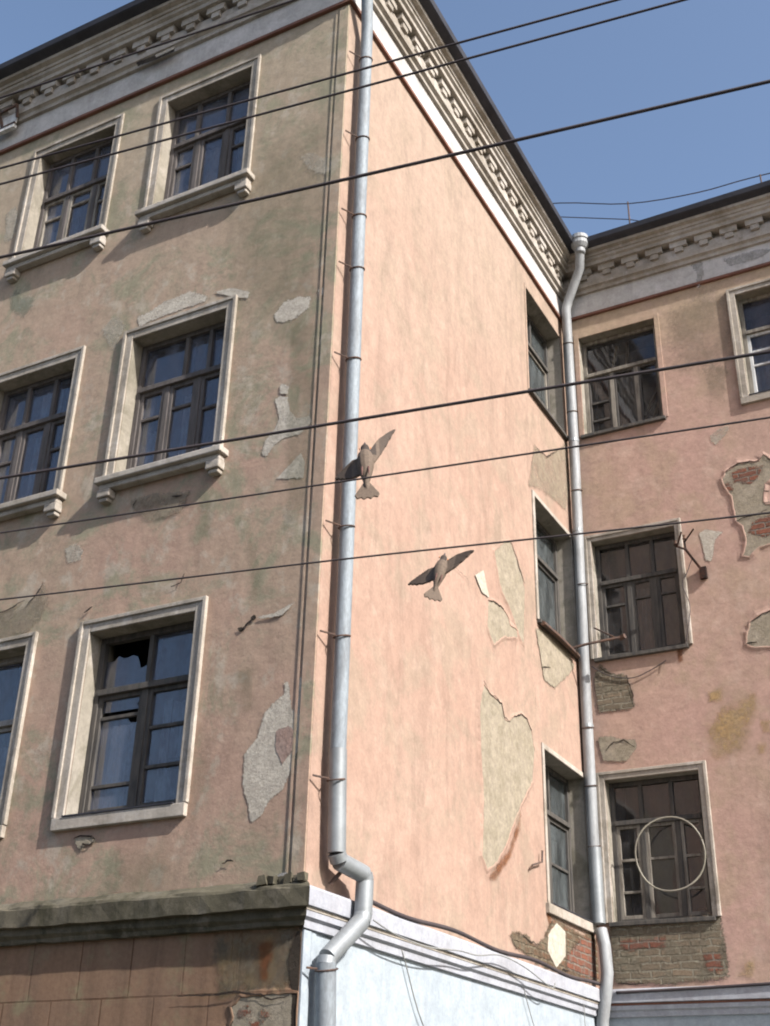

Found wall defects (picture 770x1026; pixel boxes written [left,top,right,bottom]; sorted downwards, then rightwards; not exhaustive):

peeling [262,384,312,456]
flaking render [699,448,770,562]
flaking render [739,605,770,654]
flaking render [594,664,635,713]
peeling [242,677,302,822]
flaking render [475,675,537,878]
flaking render [177,930,301,1026]
flaking render [510,918,599,985]
flaking render [609,913,730,987]